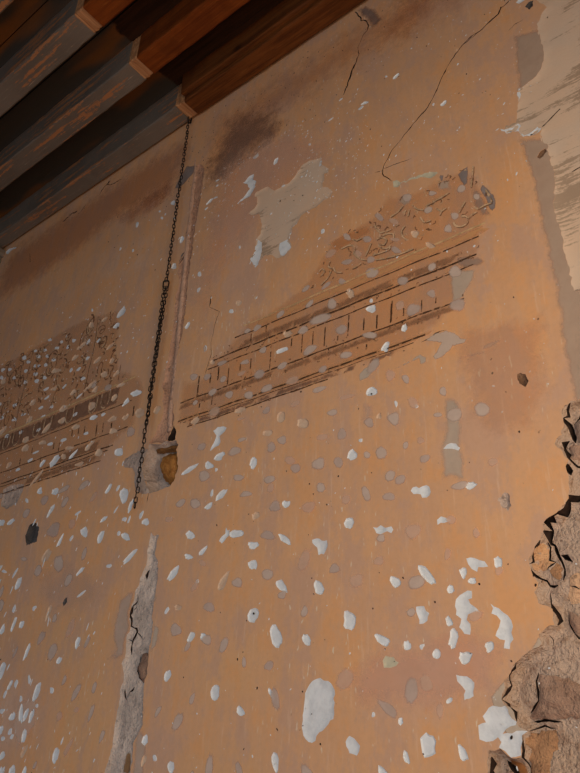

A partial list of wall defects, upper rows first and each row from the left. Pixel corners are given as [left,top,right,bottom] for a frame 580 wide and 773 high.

crack [343,12,369,95]
crack [378,1,515,180]
flaking render [501,0,580,292]
flaking render [237,158,332,268]
spalling [1,441,102,518]
spalling [105,426,178,513]
flaking render [181,426,226,475]
spalling [25,523,39,545]
flaking render [418,565,436,585]
flaking render [445,556,502,665]
flaking render [302,678,335,743]
flaking render [456,675,474,699]